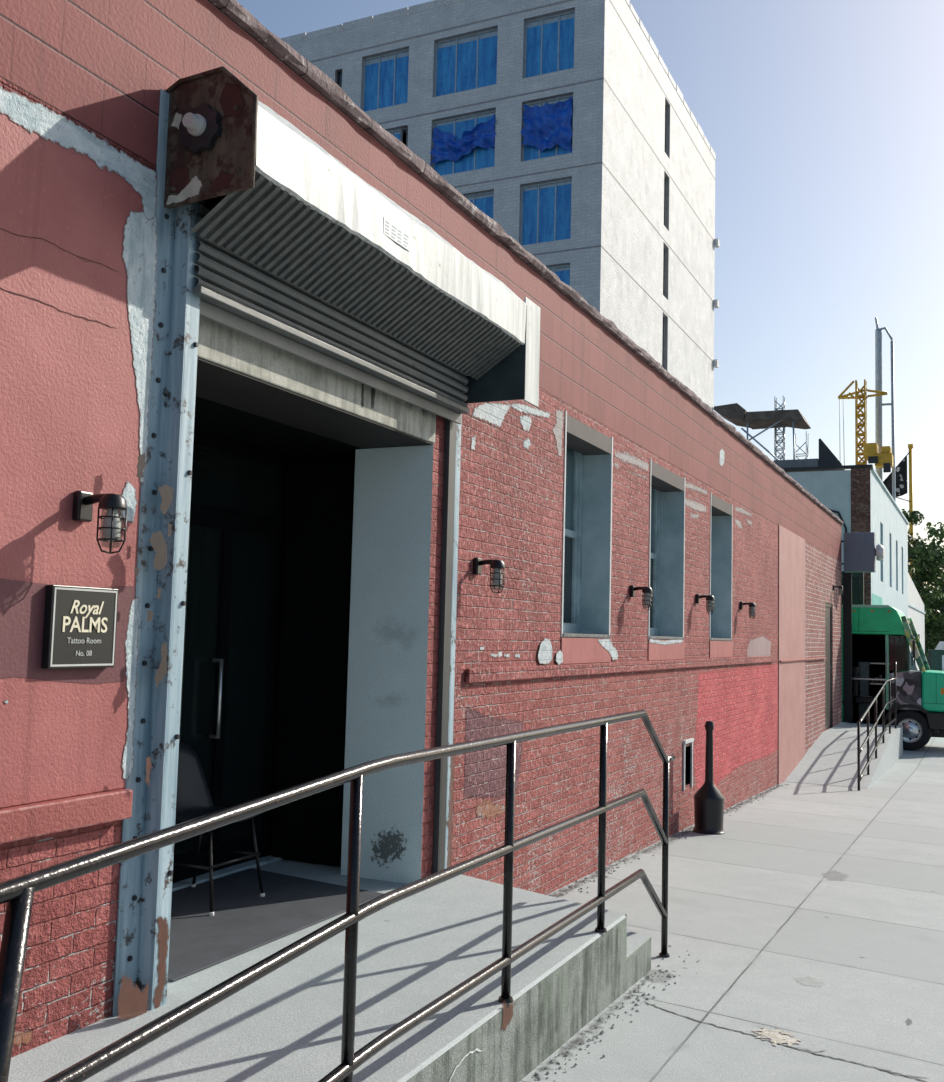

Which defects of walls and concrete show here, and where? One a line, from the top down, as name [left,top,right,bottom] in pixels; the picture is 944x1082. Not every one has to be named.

corrosion [169,166,190,193]
crack [0,228,120,273]
crack [0,287,115,328]
peeling [0,85,202,523]
peeling [472,403,563,456]
corrosion [150,484,173,571]
peeling [122,596,140,779]
corrosion [155,642,168,688]
peeling [538,638,563,665]
peeling [598,638,618,661]
leakage [371,829,407,868]
corrosion [118,917,170,1020]